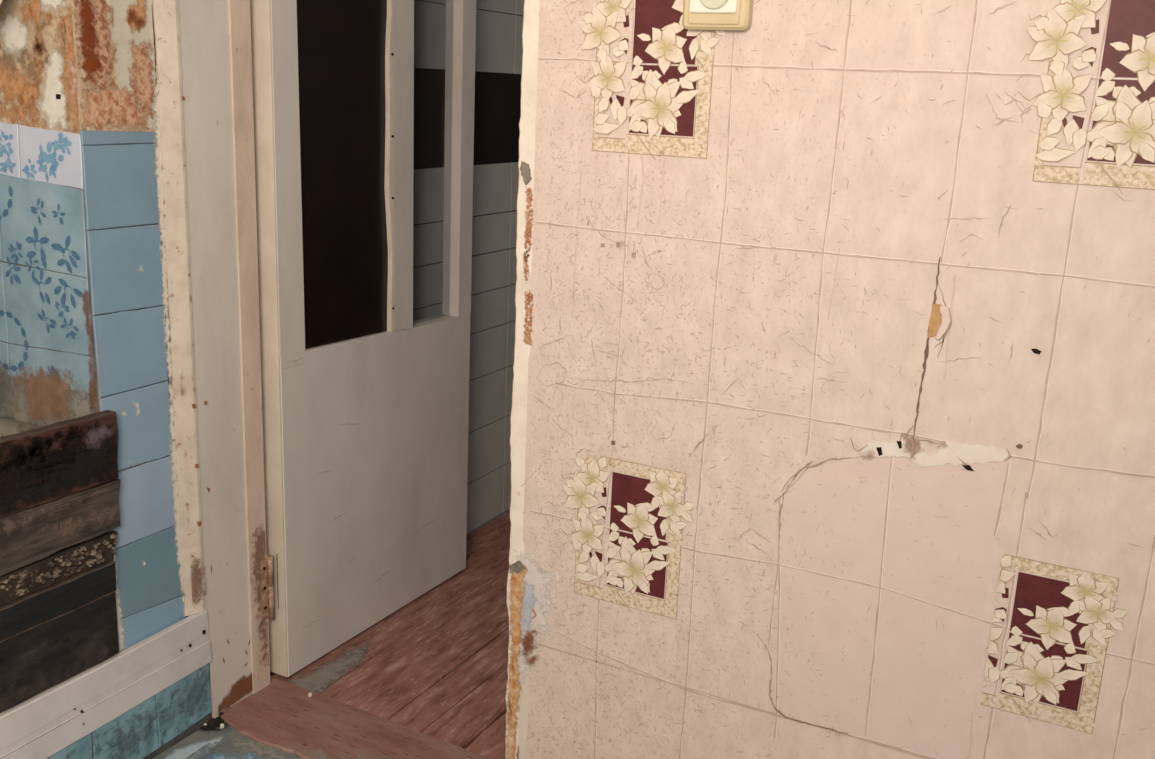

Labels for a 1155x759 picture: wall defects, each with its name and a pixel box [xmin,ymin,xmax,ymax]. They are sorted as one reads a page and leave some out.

peeling [0,0,156,133]
crack [904,258,947,440]
peeling [859,439,912,458]
rust [190,560,202,603]
peeling [218,640,253,713]
rust [254,531,268,659]
spalling [506,554,552,759]